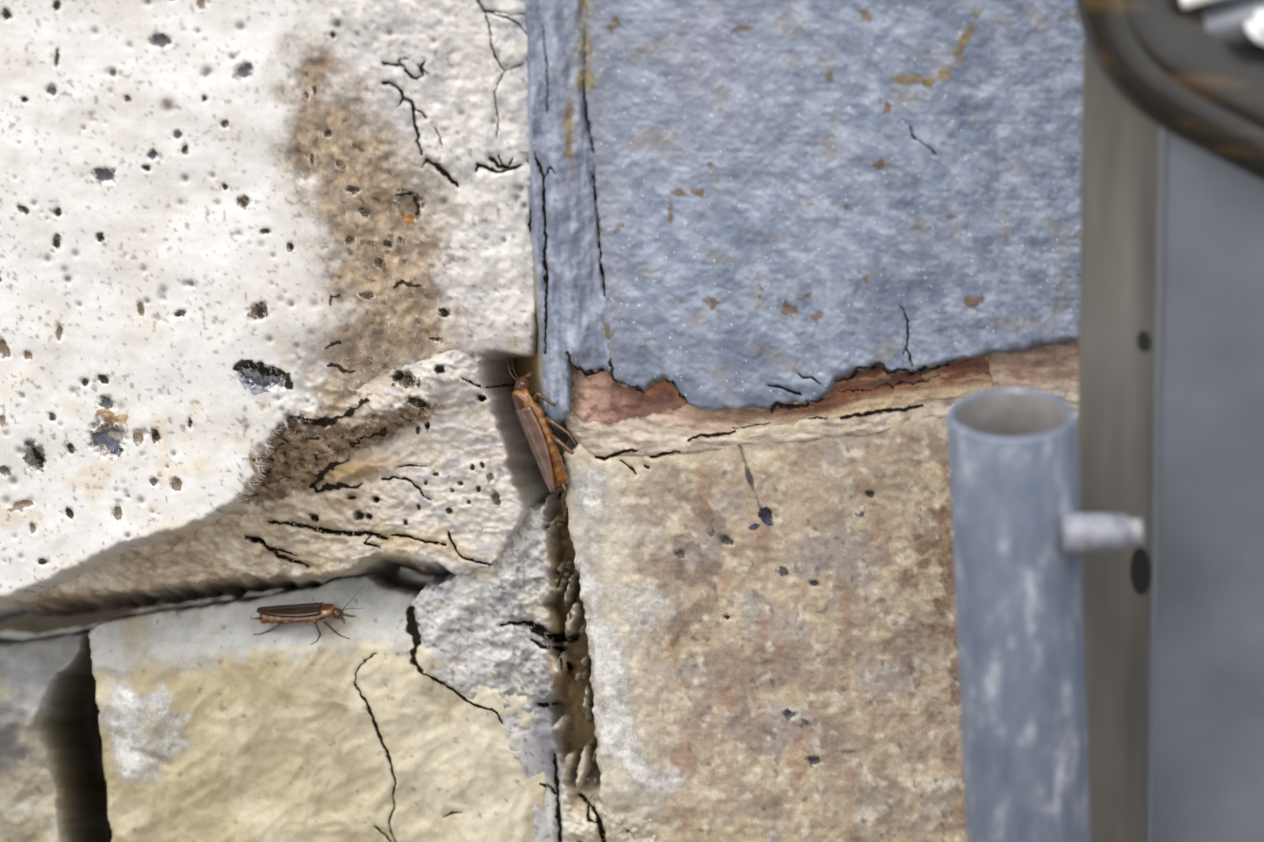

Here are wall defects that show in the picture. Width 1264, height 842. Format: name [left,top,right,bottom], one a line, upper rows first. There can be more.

crack [381,0,555,354]
crack [583,26,605,296]
spalling [232,54,450,520]
hole [450,461,501,507]
crack [354,653,396,842]
crack [406,605,503,724]
crack [539,754,635,842]